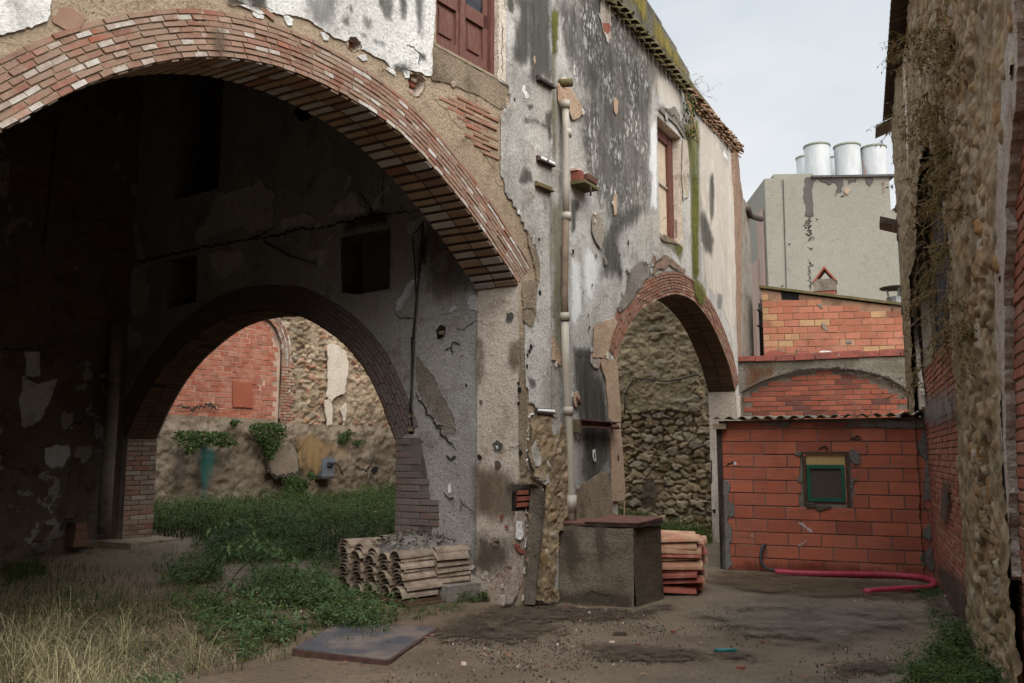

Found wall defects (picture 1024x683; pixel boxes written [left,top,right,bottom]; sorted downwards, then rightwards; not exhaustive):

leakage [508,0,655,274]
crack [132,176,420,264]
leakage [663,175,714,273]
peeling [226,0,619,606]
spalling [588,240,686,369]
peeling [19,351,57,428]
peeling [44,444,71,469]
crack [416,394,456,461]